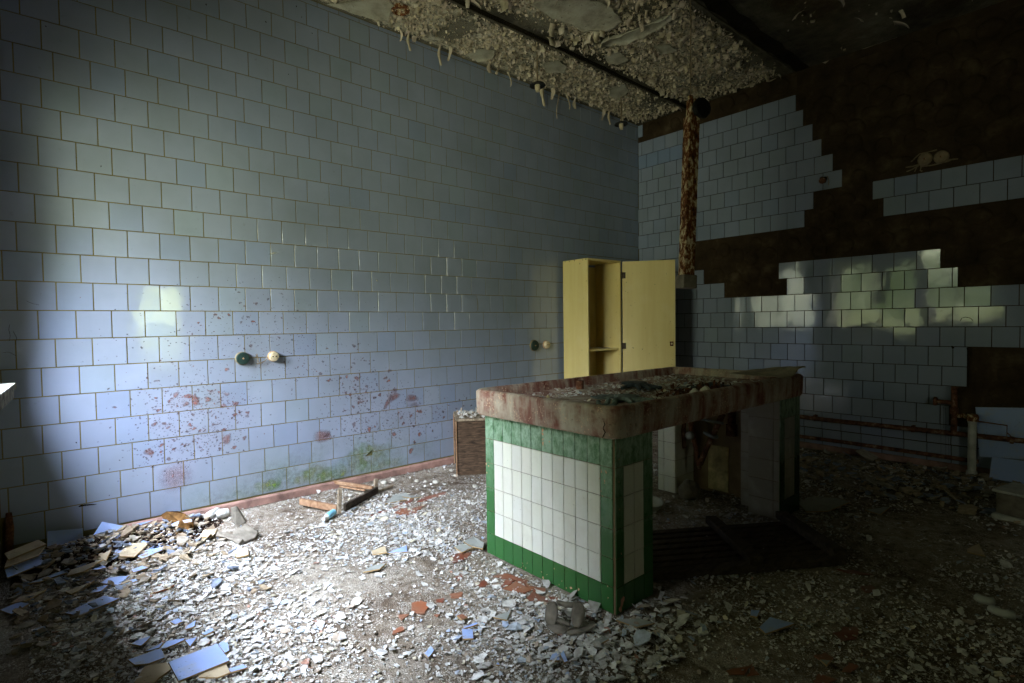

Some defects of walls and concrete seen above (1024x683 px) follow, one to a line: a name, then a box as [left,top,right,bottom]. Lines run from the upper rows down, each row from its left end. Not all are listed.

peeling [322,0,1024,298]